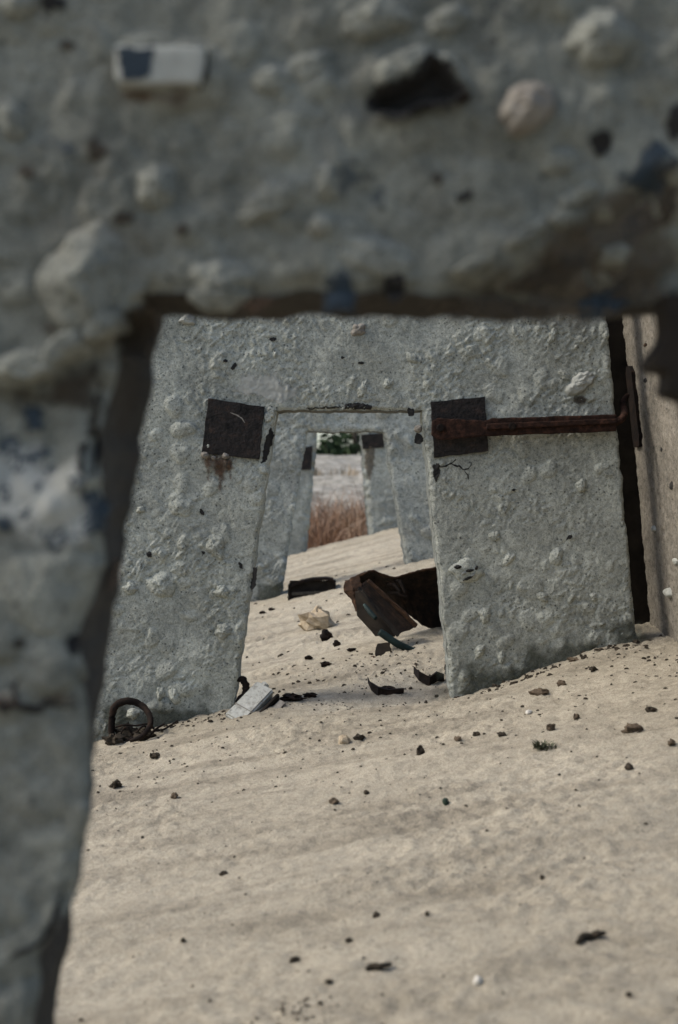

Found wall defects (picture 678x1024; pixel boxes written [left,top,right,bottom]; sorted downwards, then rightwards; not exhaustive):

rust [205,455,232,489]
crack [440,459,472,480]